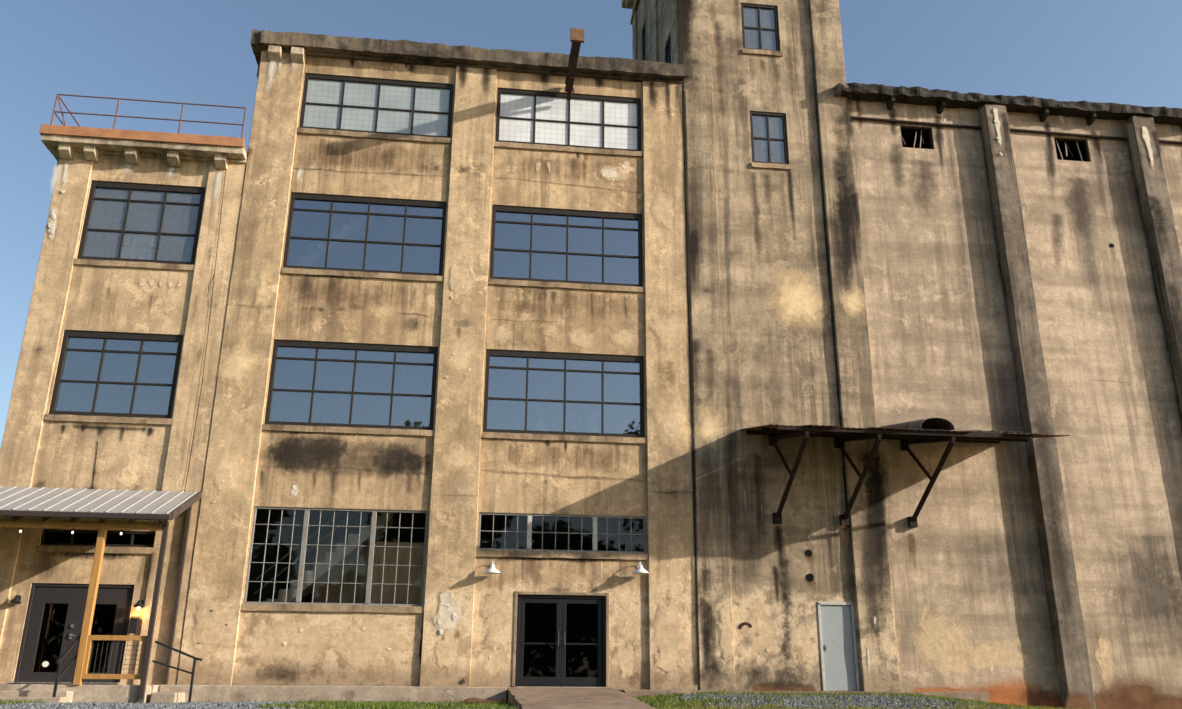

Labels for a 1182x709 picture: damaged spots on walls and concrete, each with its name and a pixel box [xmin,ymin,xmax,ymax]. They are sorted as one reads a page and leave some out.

leakage [835,153,860,283]
leakage [1129,146,1182,420]
leakage [273,431,428,483]
leakage [868,458,887,637]
peeling [433,593,467,684]